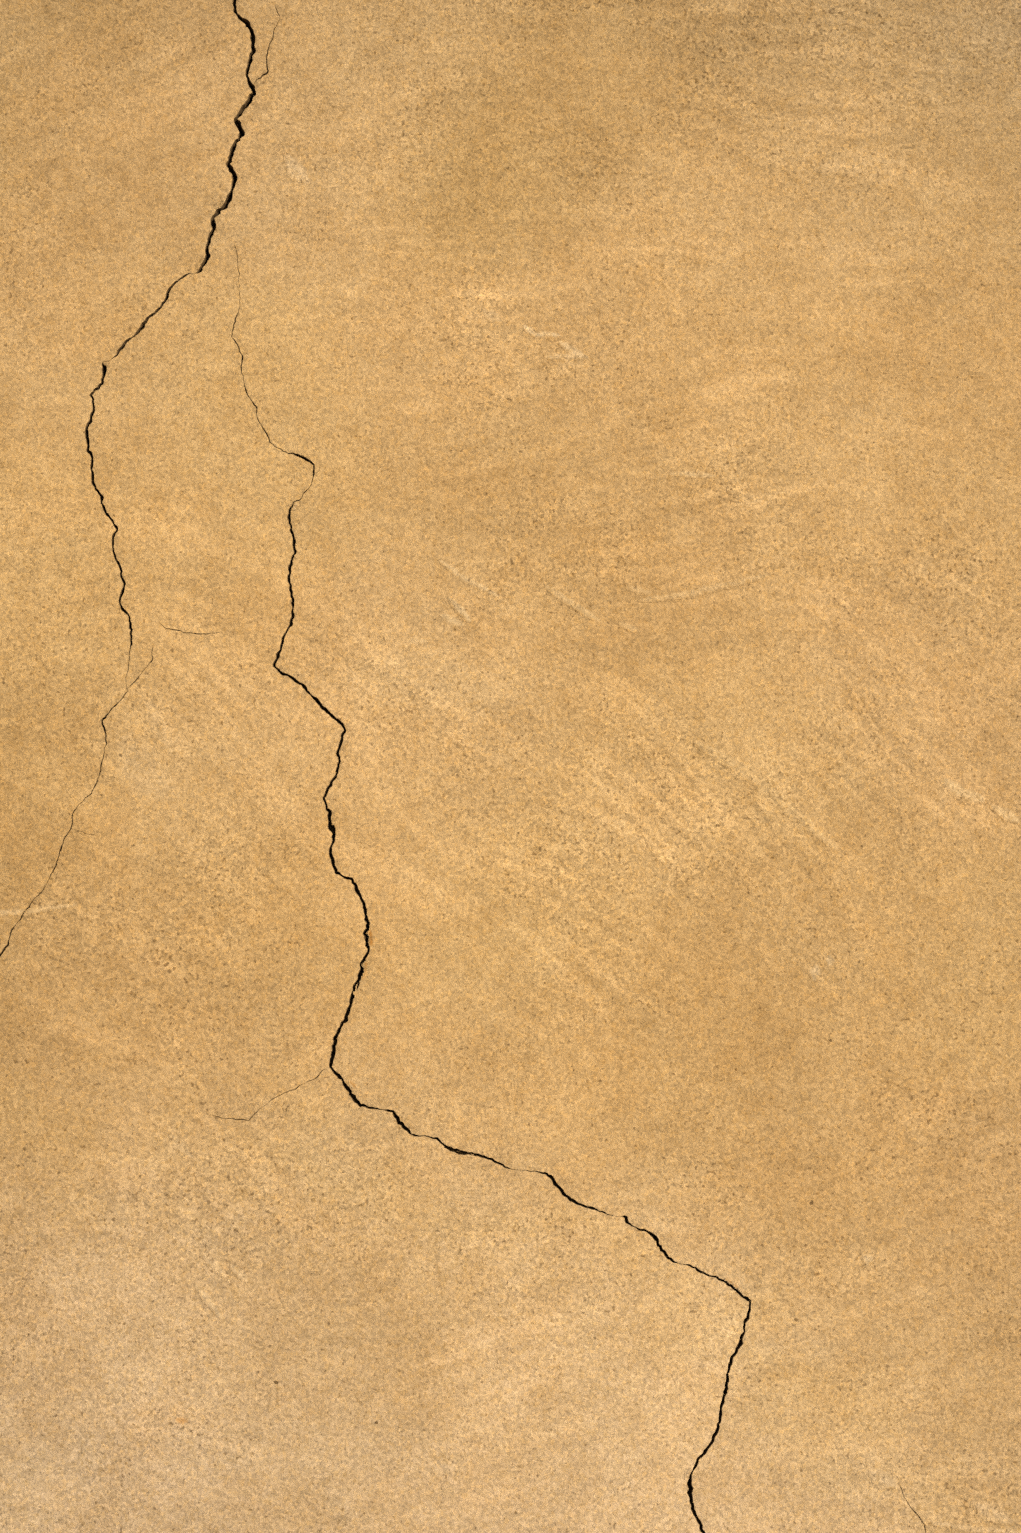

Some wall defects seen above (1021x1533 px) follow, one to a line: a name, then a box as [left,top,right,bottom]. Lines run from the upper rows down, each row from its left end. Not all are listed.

crack [0,0,751,1533]